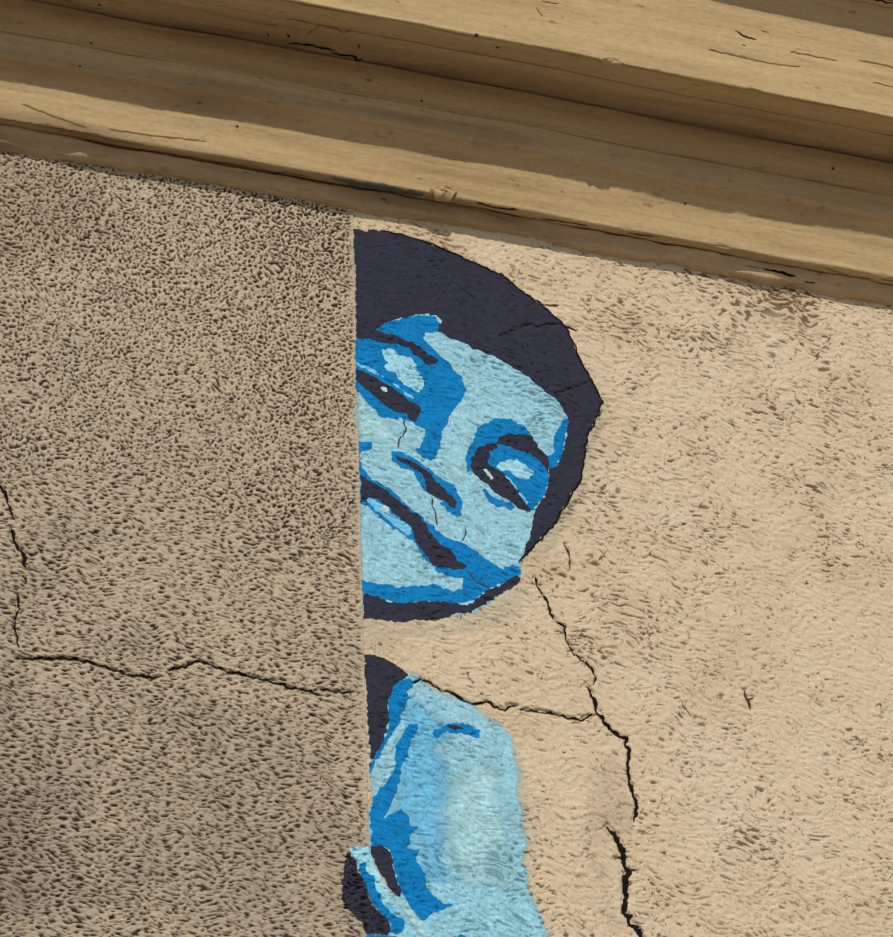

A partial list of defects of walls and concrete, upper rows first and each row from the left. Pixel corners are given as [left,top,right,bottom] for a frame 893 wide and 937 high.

crack [0,485,353,696]
crack [413,577,643,937]